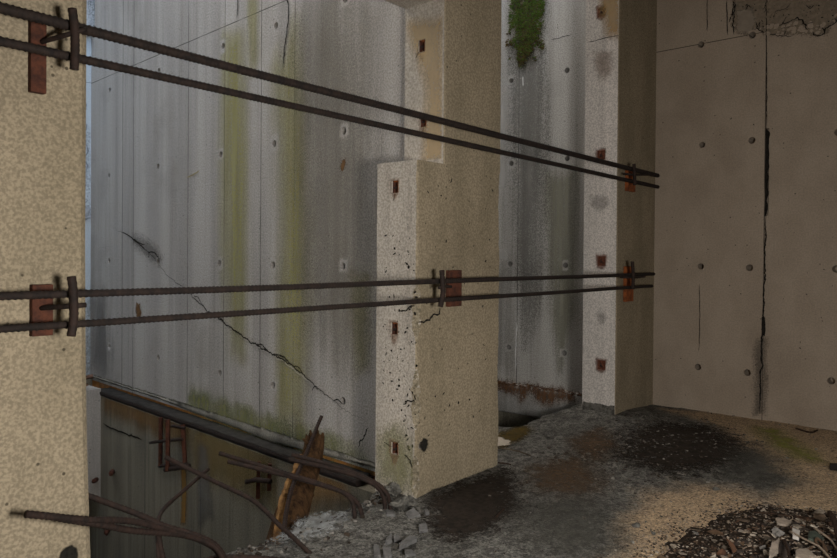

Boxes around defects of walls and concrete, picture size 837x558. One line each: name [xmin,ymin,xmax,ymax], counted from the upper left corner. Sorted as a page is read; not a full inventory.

crack [282,0,290,63]
peeling [729,0,837,37]
crack [759,5,770,414]
crack [118,231,369,446]
spalling [382,285,445,450]
corrosion [497,380,579,409]
corrosion [105,398,276,507]